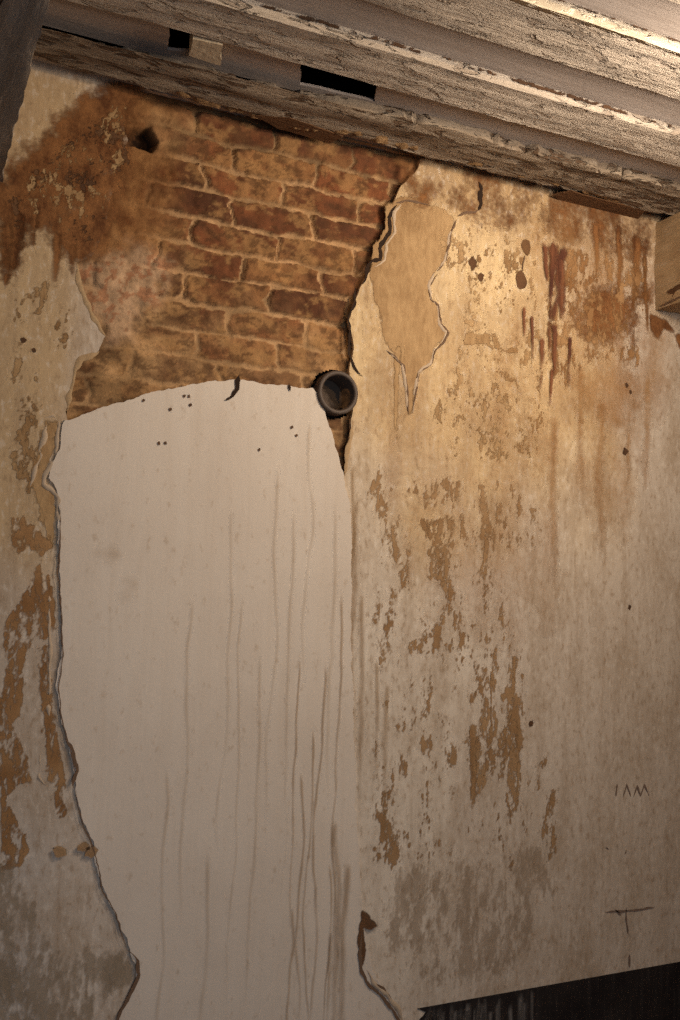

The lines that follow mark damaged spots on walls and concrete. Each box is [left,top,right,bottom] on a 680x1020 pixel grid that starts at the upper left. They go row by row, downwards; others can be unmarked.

peeling [263,4,342,30]
peeling [367,36,424,54]
peeling [510,77,628,115]
water stain [401,152,442,205]
crack [459,182,483,216]
water stain [465,167,529,228]
flaking render [8,92,680,461]
crack [347,200,431,376]
water stain [542,190,655,349]
flaking render [326,411,354,475]
peeling [368,470,557,870]
peeling [0,396,93,1020]